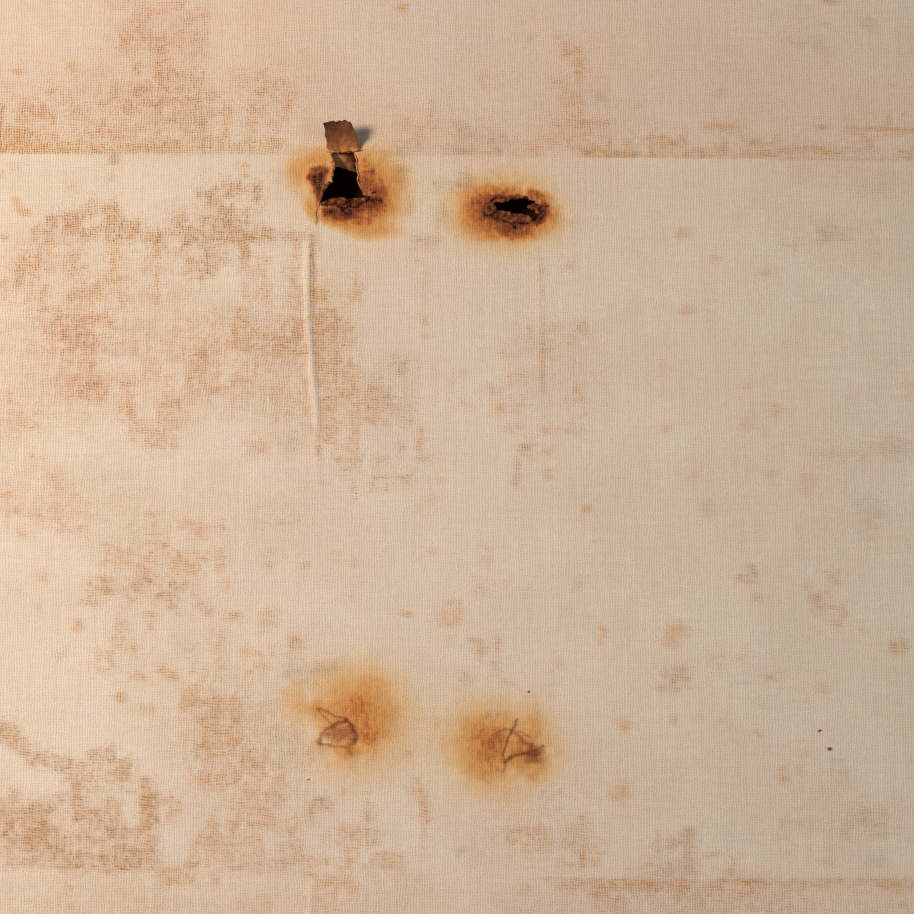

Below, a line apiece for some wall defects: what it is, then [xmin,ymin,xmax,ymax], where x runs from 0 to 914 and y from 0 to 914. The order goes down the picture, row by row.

peeling [321,197,365,206]